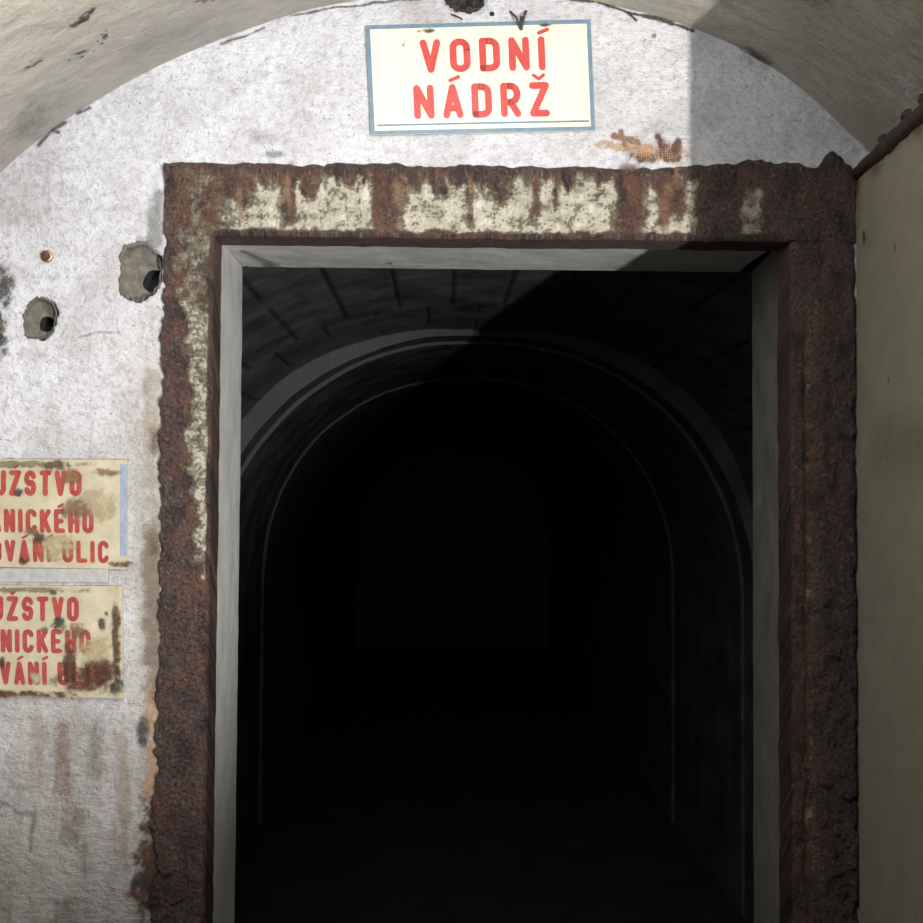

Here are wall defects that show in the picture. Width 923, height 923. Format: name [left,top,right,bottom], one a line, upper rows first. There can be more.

spalling [445,0,494,16]
rust [851,93,923,179]
rust [597,129,687,211]
damp [0,267,14,307]
spalling [22,296,58,340]
spalling [118,241,162,303]